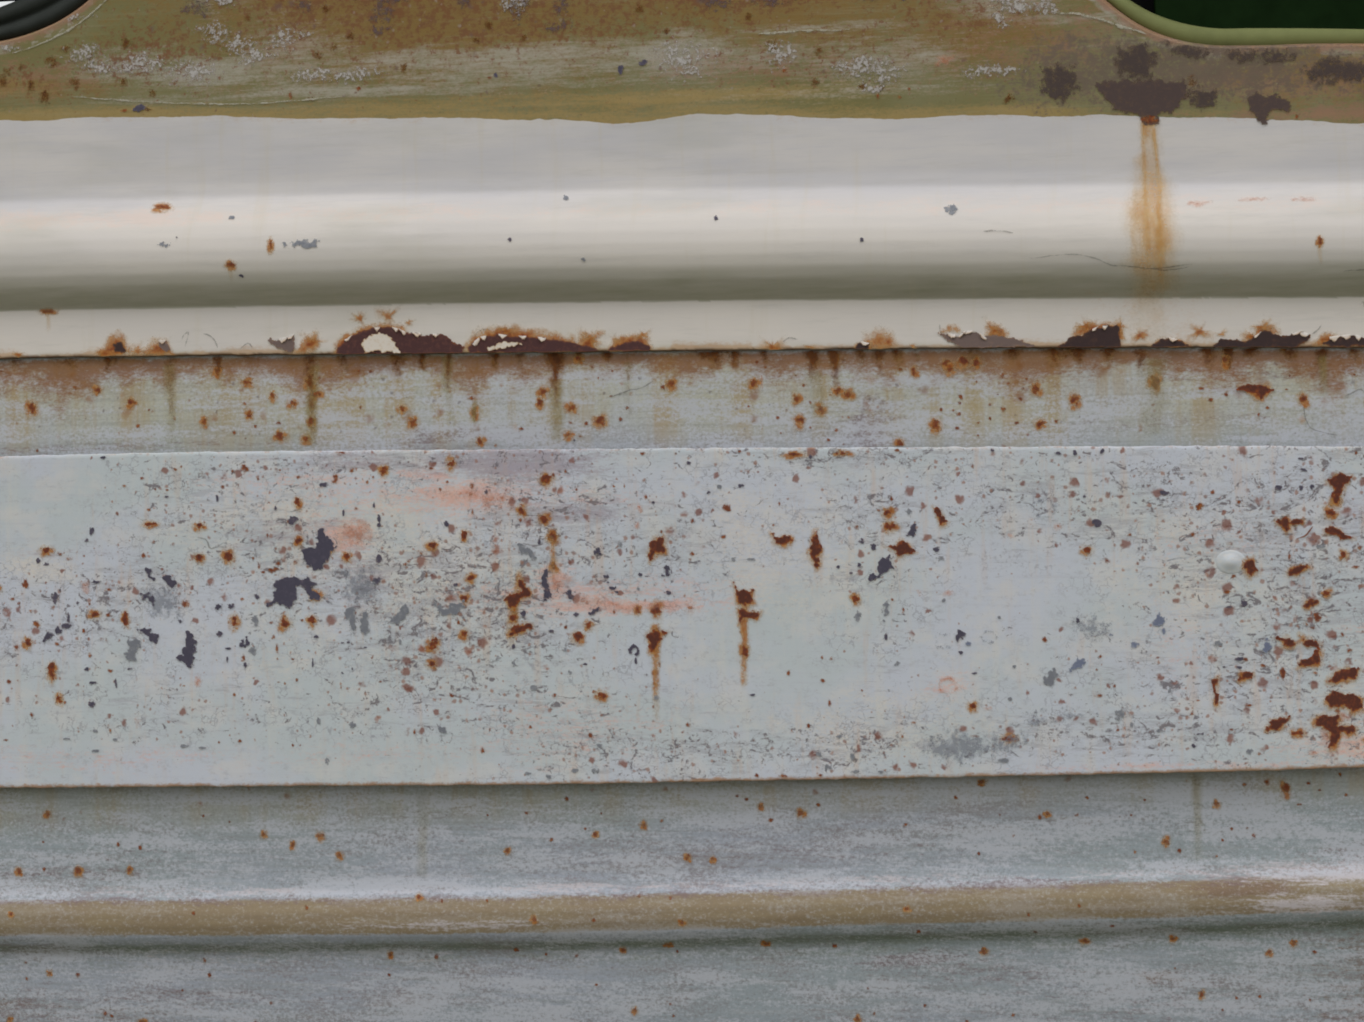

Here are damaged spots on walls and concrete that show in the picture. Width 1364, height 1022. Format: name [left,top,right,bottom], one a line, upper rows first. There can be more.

peeling [1039,41,1364,125]
peeling [335,324,650,354]
peeling [1058,322,1125,348]
peeling [1213,325,1364,348]
rust [535,332,629,442]
rust [776,333,920,434]
rust [1199,375,1310,415]
peeling [176,620,197,668]
peeling [216,528,337,668]
rust [733,582,760,683]
rust [1224,558,1258,593]
rust [1237,589,1364,750]